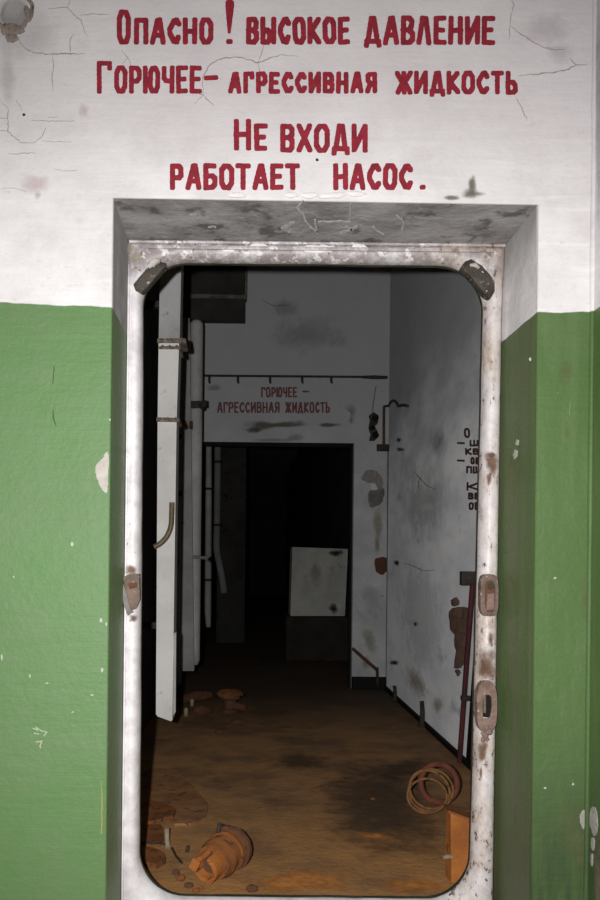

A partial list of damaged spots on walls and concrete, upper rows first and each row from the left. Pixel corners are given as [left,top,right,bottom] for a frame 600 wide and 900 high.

spalling [0,0,34,43]
crack [19,2,110,86]
crack [509,0,585,76]
crack [196,45,298,106]
crack [0,101,71,155]
peeling [95,452,109,493]
spalling [361,470,385,508]
corrosion [486,453,497,484]
peeling [579,806,598,867]